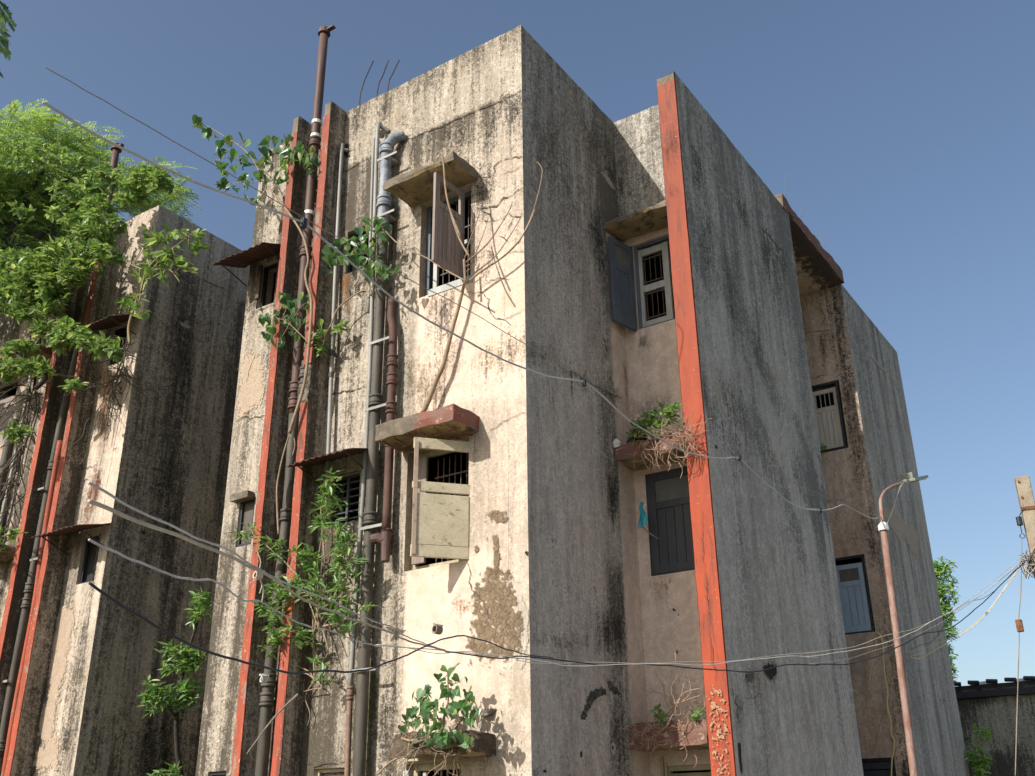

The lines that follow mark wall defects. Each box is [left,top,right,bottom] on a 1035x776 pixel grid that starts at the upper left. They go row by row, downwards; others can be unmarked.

damp [471,174,494,213]
crack [477,156,523,253]
crack [470,278,519,324]
damp [607,475,618,524]
flaking render [876,498,920,559]
damp [586,566,625,661]
peeling [708,684,744,776]